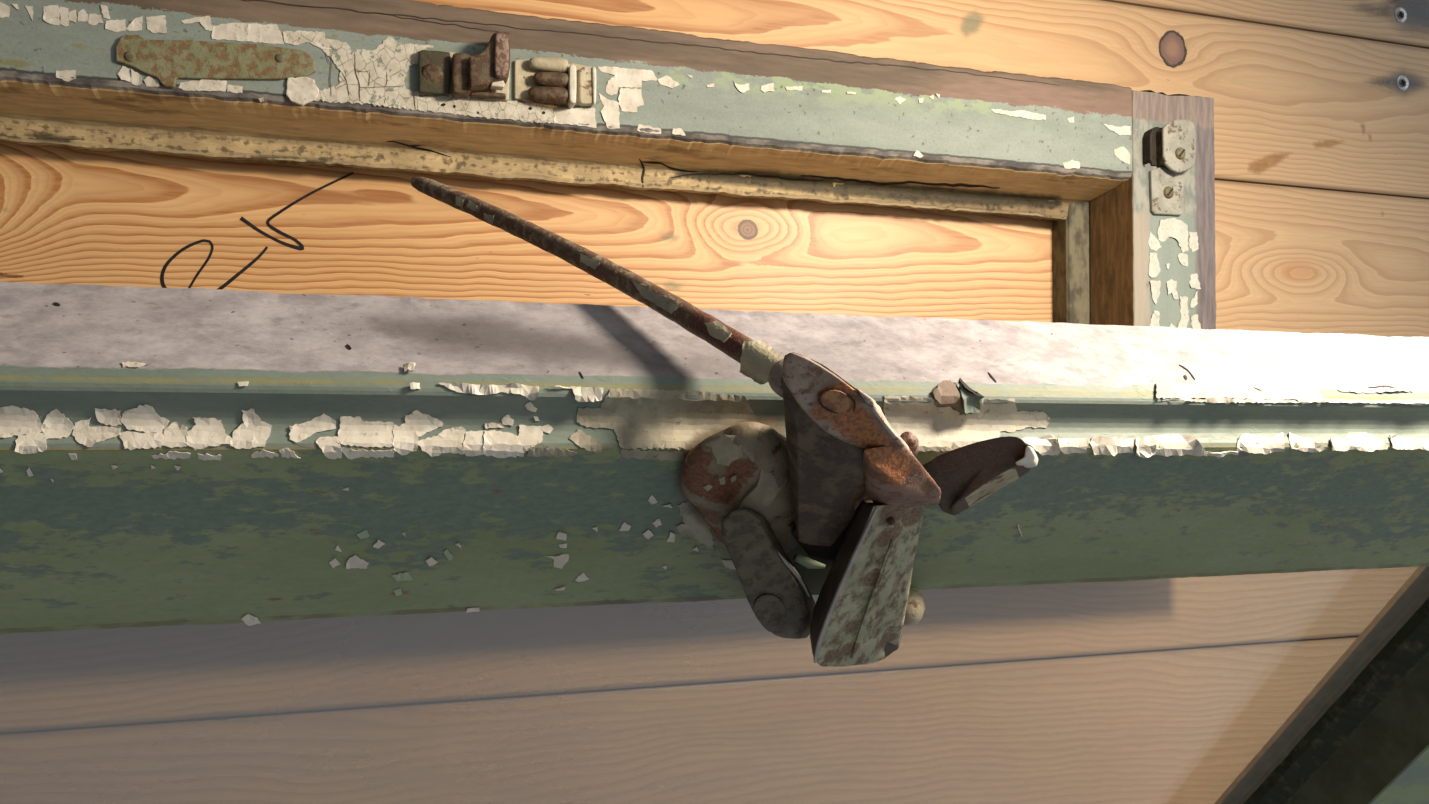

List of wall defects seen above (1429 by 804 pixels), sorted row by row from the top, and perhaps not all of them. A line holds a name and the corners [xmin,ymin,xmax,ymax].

peeling [0,2,715,136]
rust [526,98,567,107]
peeling [734,82,803,93]
peeling [991,109,1046,120]
crack [639,159,1000,189]
peeling [1063,160,1080,169]
peeling [1104,124,1131,164]
peeling [1148,218,1201,329]
peeling [705,320,784,385]
peeling [0,382,787,511]
rust [684,417,786,461]
peeling [883,395,1429,458]